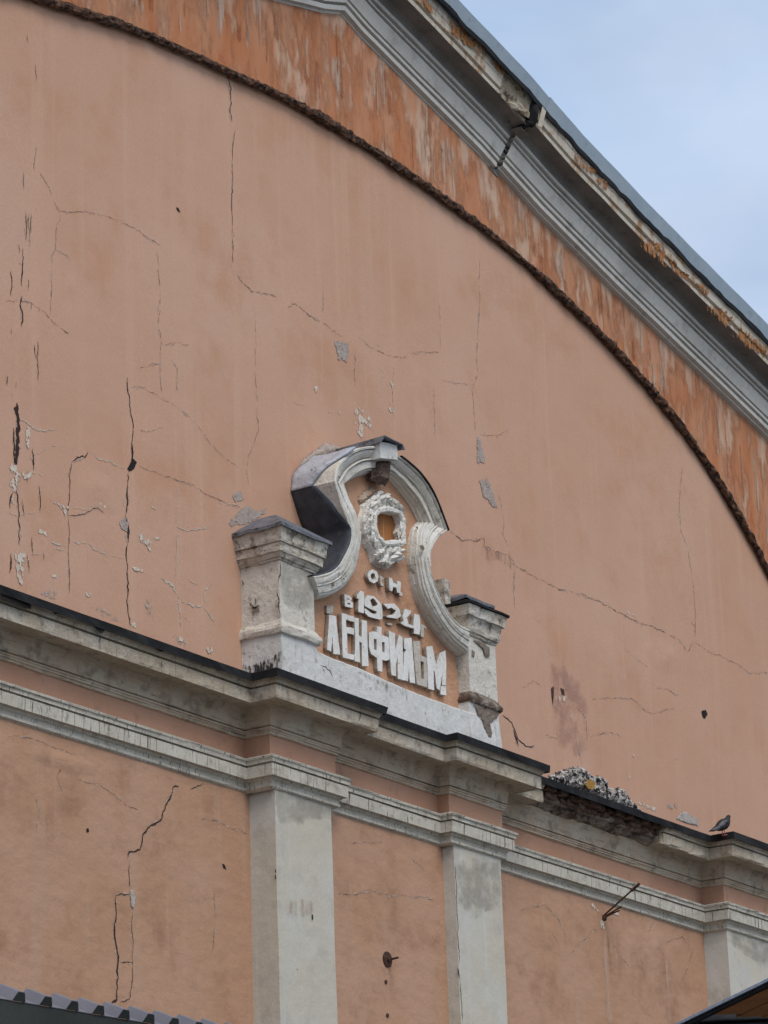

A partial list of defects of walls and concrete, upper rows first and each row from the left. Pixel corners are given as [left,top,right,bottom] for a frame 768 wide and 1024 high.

crack [228,76,441,417]
crack [6,148,259,626]
crack [451,472,767,675]
flaking render [474,705,500,738]
crack [504,716,557,748]
flaking render [526,687,698,846]
crack [14,735,203,1003]